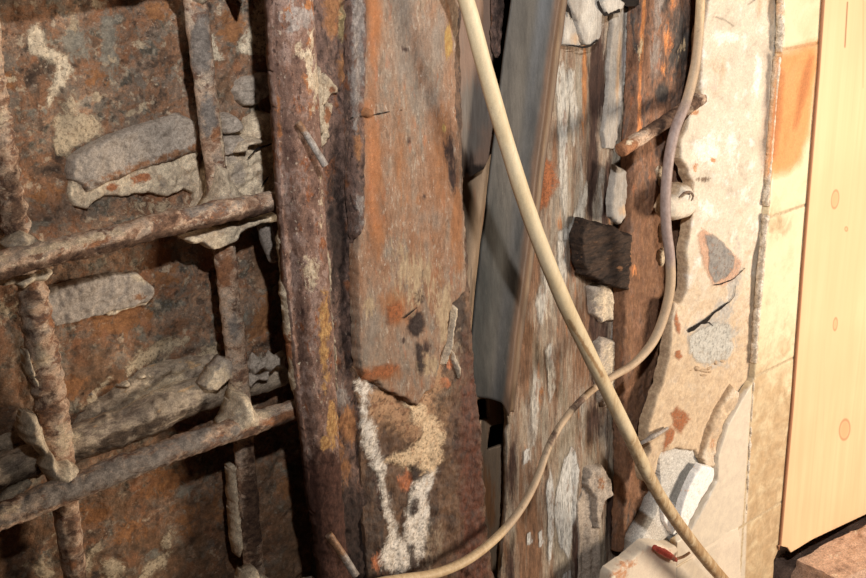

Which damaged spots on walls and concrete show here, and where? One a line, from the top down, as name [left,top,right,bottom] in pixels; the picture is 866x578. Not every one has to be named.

flaking render [561,0,629,149]
spalling [64,113,200,209]
corrosion [540,160,559,208]
peeling [178,212,277,250]
corrosion [349,0,466,442]
spalling [47,271,155,326]
crack [687,268,745,333]
peeling [195,354,233,391]
corrosion [664,408,690,450]
peeling [224,461,243,557]
water stain [354,378,446,574]
spalling [671,462,714,526]